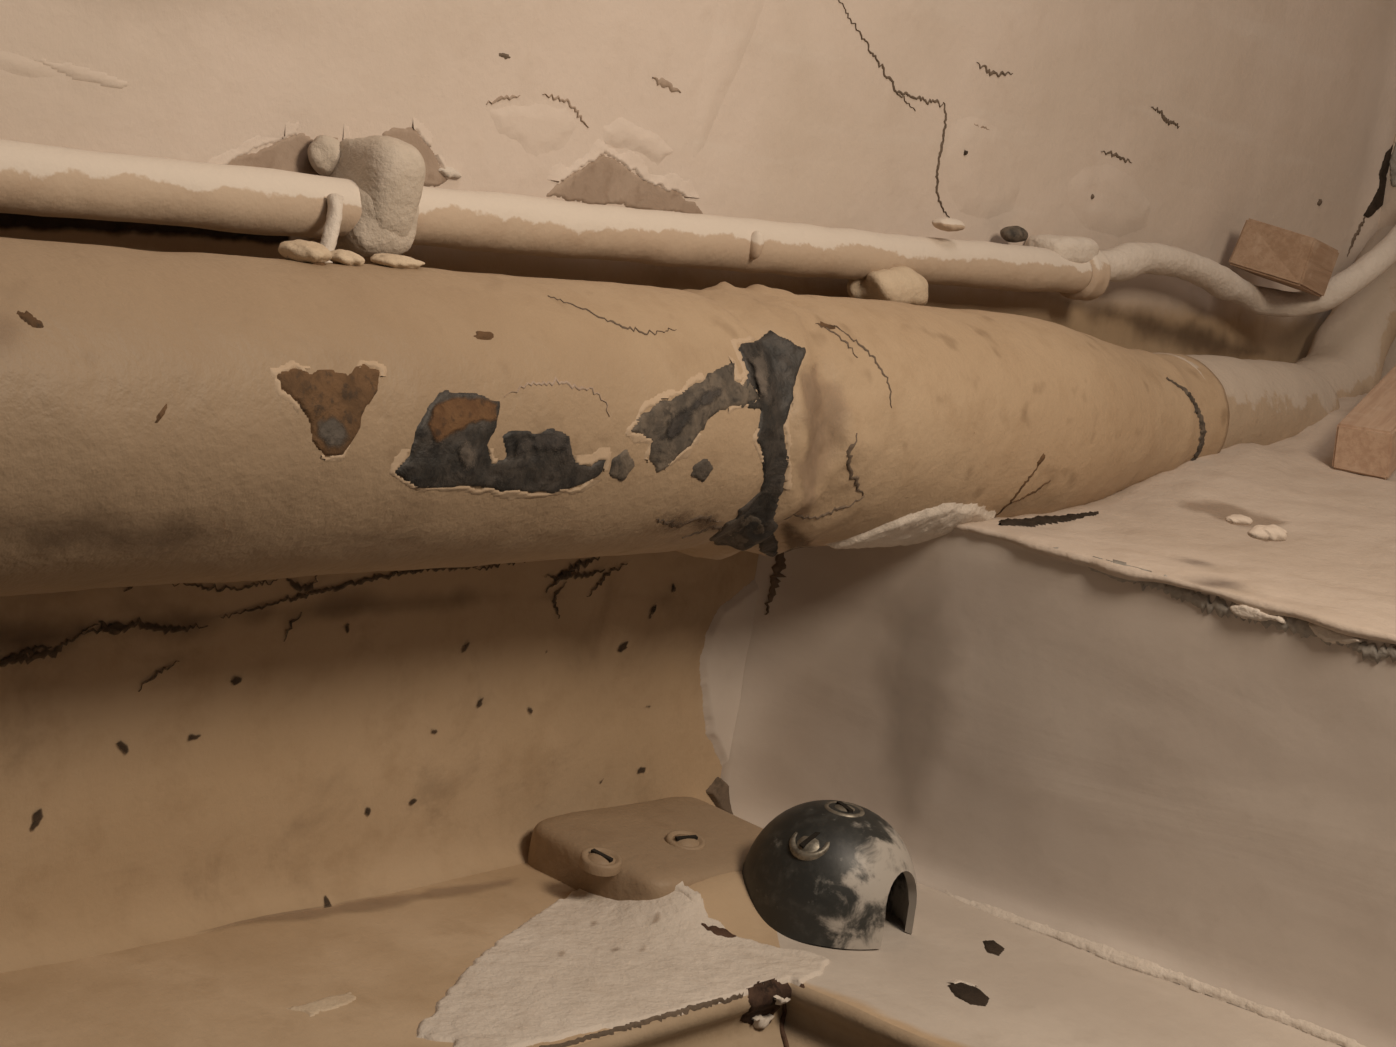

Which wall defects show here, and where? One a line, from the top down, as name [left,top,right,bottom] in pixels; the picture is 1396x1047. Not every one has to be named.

flaking render [653,77,681,93]
crack [838,0,950,218]
flaking render [207,121,321,176]
flaking render [382,118,462,187]
flaking render [486,94,703,214]
rust [270,360,387,461]
peeling [609,330,811,557]
crack [995,453,1051,516]
peeling [416,881,830,1047]
peeling [286,992,356,1017]
crack [539,992,744,1047]